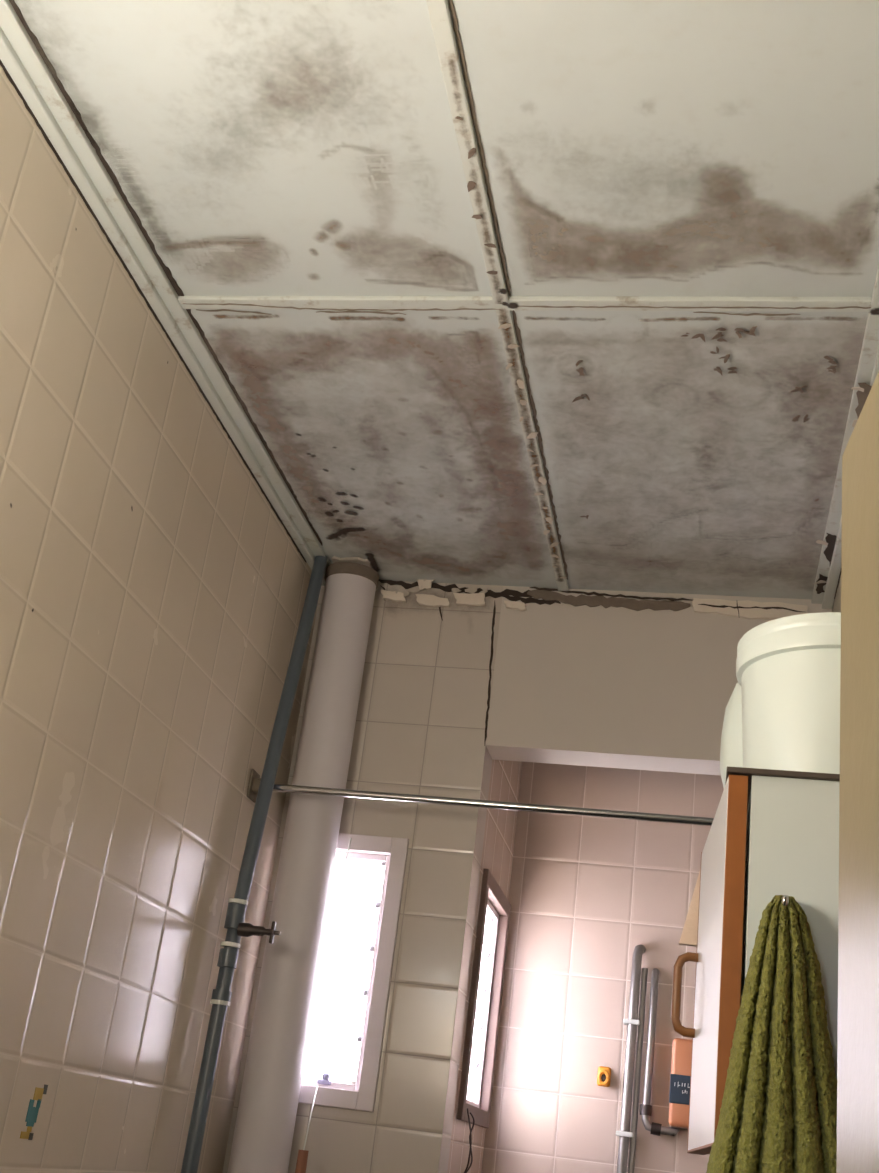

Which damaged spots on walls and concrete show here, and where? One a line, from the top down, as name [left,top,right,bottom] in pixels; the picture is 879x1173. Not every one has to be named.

peeling [467,181,483,219]
leakage [518,176,788,271]
spalling [851,383,872,427]
leakage [227,347,470,573]
spalling [487,271,808,619]
peeling [380,579,488,607]
spalling [813,533,837,594]